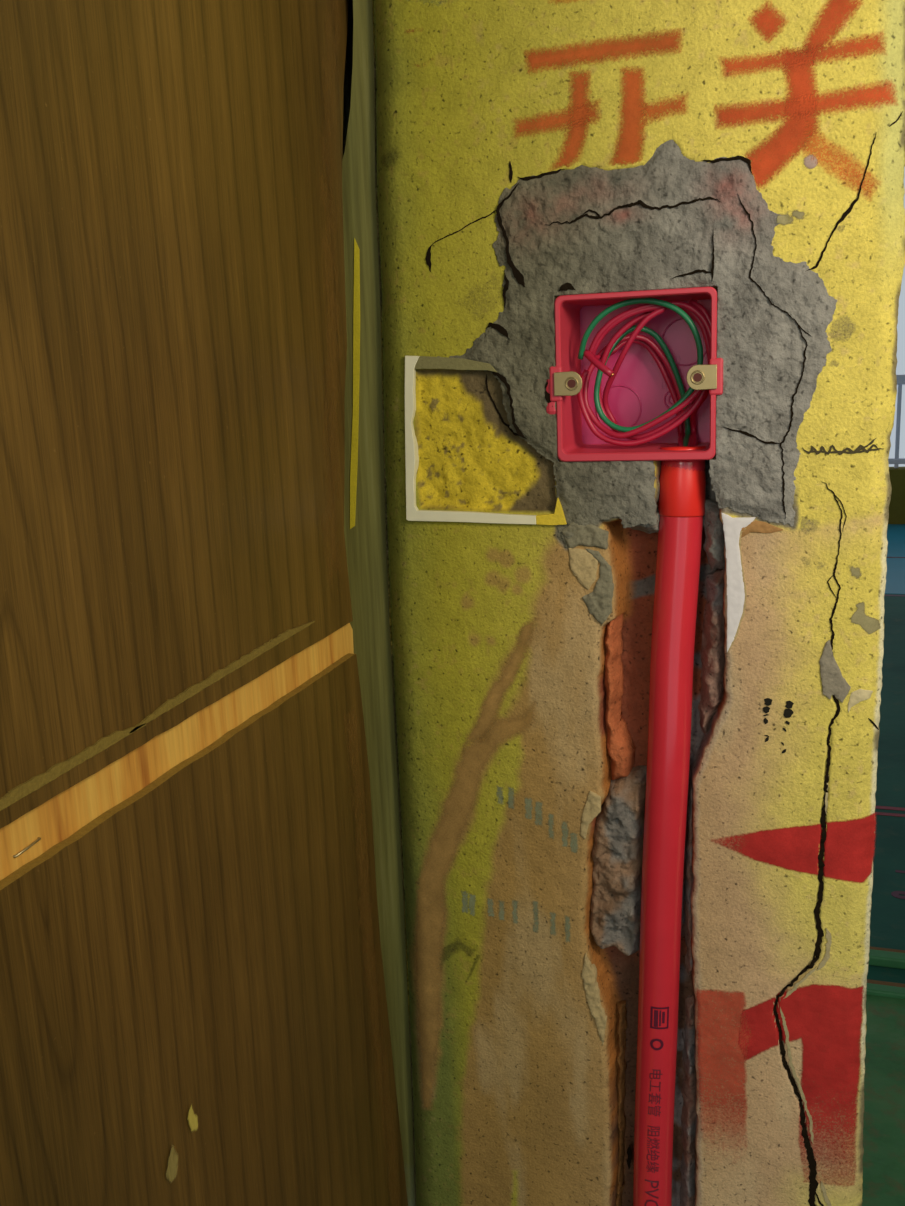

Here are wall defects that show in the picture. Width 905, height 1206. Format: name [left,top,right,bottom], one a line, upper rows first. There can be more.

crack [425,162,565,339]
crack [807,111,903,271]
crack [485,370,527,439]
crack [545,155,811,517]
flaking render [561,522,614,624]
crack [823,482,847,650]
flaking render [580,791,601,839]
flaking render [581,954,607,1045]
crack [773,695,840,1206]